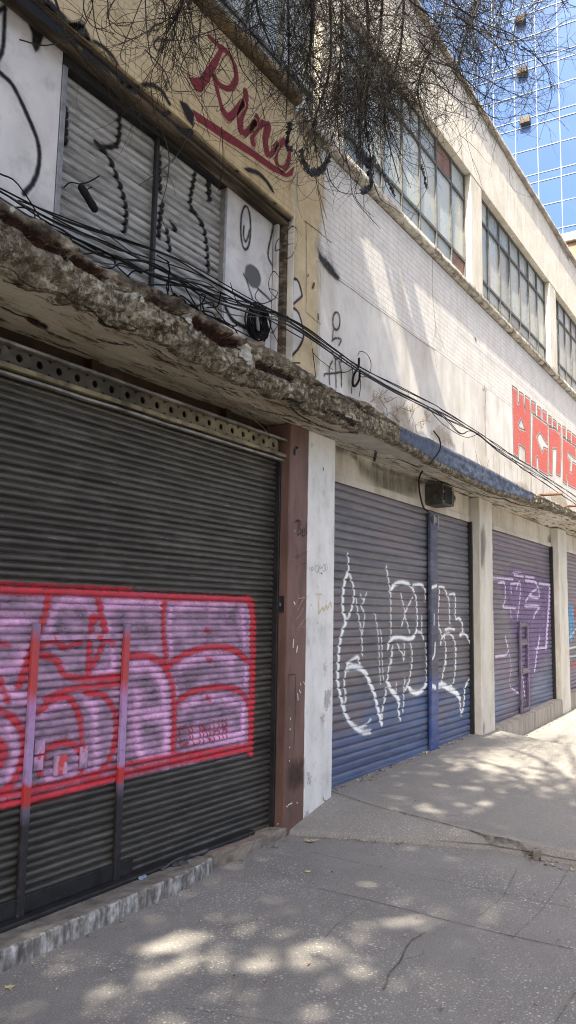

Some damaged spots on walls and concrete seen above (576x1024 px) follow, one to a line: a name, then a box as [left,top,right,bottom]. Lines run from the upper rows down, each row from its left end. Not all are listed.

spalling [0,206,104,281]
spalling [25,316,48,329]
spalling [130,292,294,383]
damp [290,762,303,786]